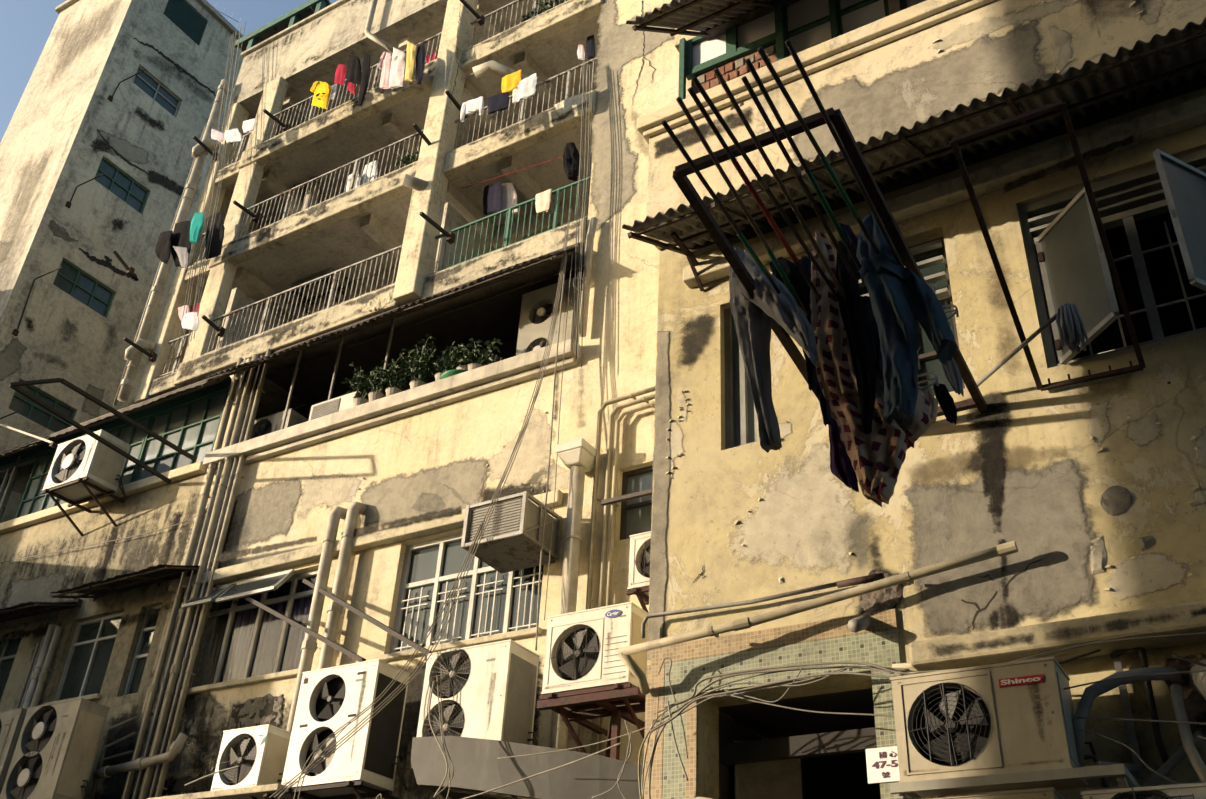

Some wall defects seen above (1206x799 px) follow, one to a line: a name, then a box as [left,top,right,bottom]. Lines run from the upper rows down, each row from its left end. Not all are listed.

crack [133,38,216,96]
crack [632,0,656,105]
crack [79,248,139,281]
peeling [411,484,472,513]
peeling [728,443,863,584]
damp [912,392,1172,655]
crack [961,559,1042,630]
peeling [1103,536,1193,600]
damp [0,490,317,799]